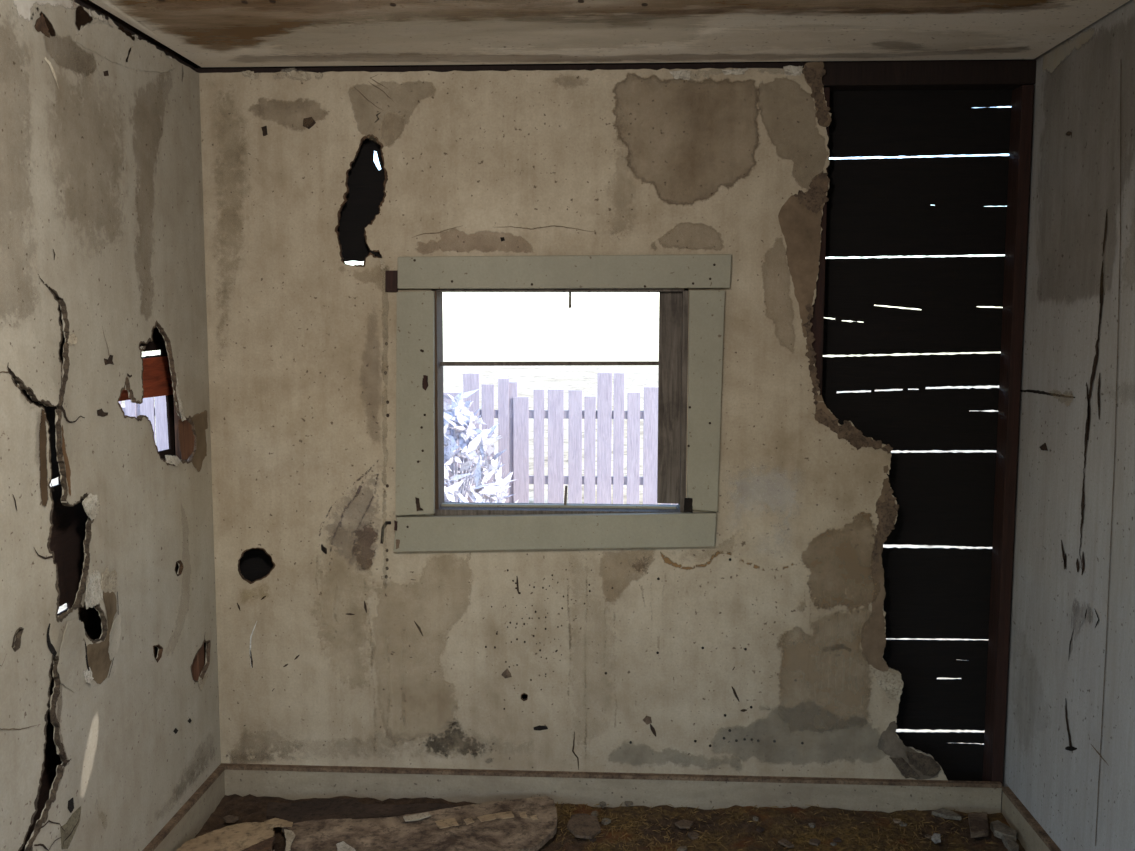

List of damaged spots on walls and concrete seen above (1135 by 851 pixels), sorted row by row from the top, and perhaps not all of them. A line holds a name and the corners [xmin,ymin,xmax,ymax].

peeling [13,0,183,82]
peeling [783,61,831,127]
spalling [335,76,393,270]
crack [0,249,85,510]
spalling [97,320,208,472]
peeling [778,171,904,702]
spalling [12,627,24,652]
spalling [34,493,122,692]
crack [0,623,71,851]
spalling [60,798,81,849]
leakage [426,722,481,756]
spalling [877,721,941,780]